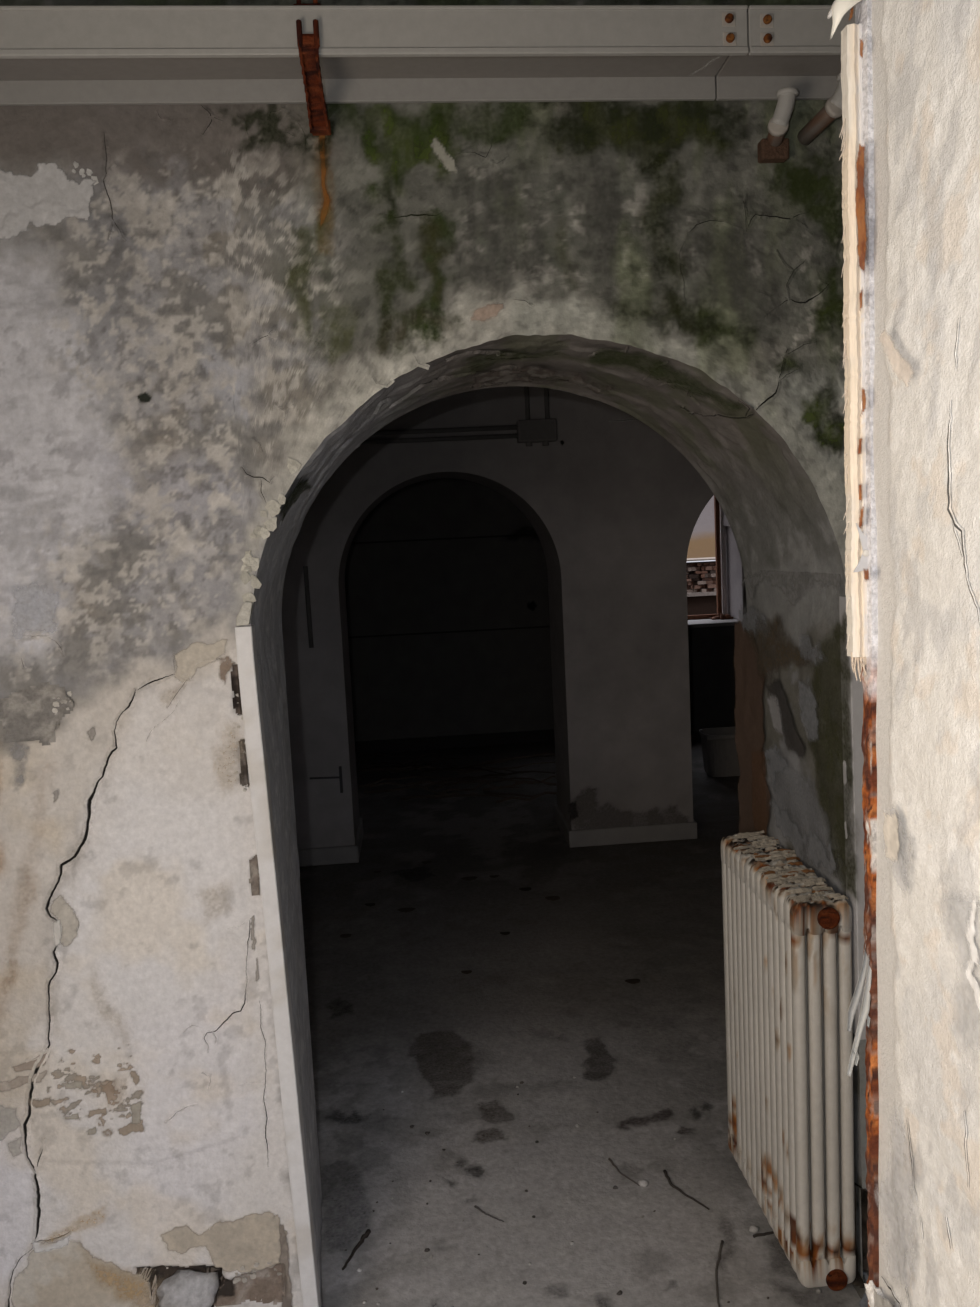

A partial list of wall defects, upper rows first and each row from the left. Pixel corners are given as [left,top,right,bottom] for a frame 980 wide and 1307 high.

water stain [447,102,526,142]
peeling [0,161,99,239]
rust [319,135,330,236]
water stain [376,191,453,351]
crack [946,317,980,626]
peeling [734,607,836,874]
crack [4,652,220,1307]
peeling [0,1048,144,1156]
peeling [11,1212,292,1307]